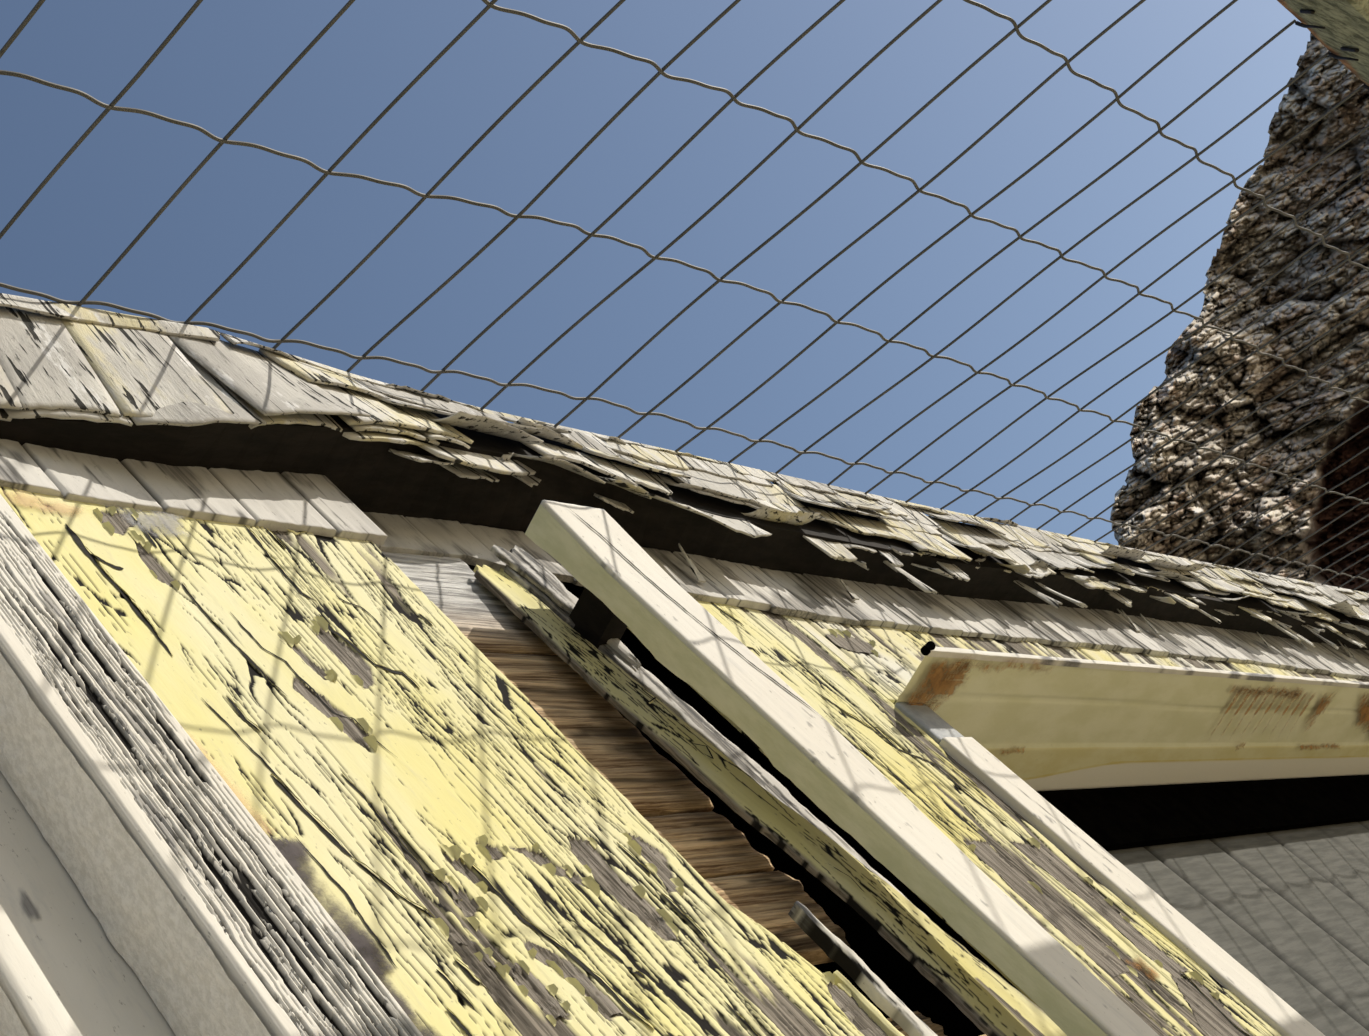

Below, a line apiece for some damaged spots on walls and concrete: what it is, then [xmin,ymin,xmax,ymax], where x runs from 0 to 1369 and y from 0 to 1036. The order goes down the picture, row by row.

peeling [93,506,180,590]
spalling [560,581,584,599]
peeling [279,616,378,752]
rust [908,660,1040,709]
rust [1218,686,1334,748]
spalling [618,628,1024,1036]
peeling [431,834,679,1027]
peeling [963,837,1248,1036]